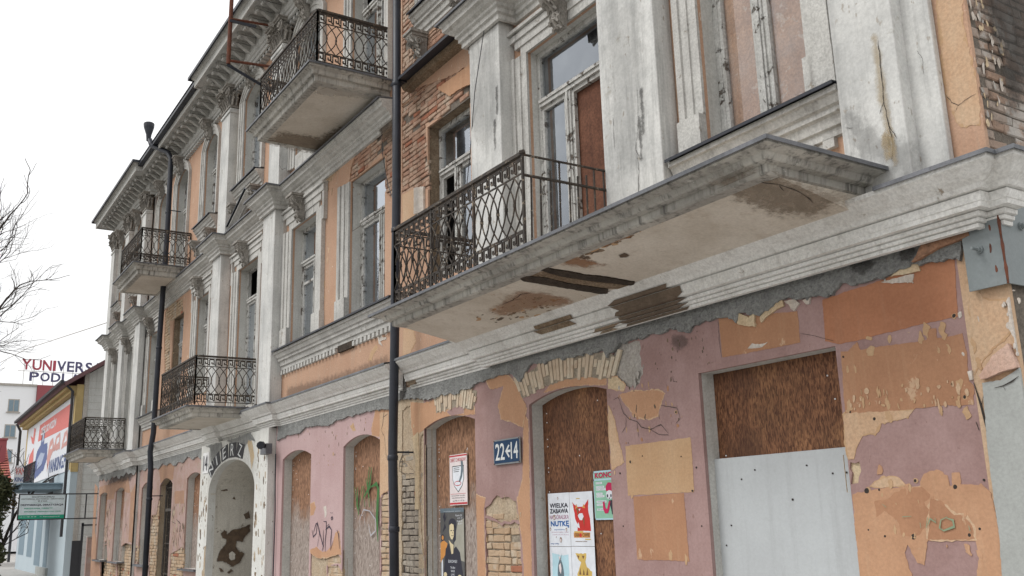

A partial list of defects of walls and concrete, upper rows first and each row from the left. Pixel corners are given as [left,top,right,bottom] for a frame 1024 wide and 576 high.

crack [878,46,896,160]
peeling [935,0,1024,149]
flaking render [350,64,470,222]
water stain [722,172,845,214]
flaking render [476,297,576,335]
flaking render [531,271,689,334]
spalling [737,297,811,327]
spalling [882,264,921,284]
crack [615,381,680,435]
peeling [842,279,1021,562]
flaking render [402,337,712,576]